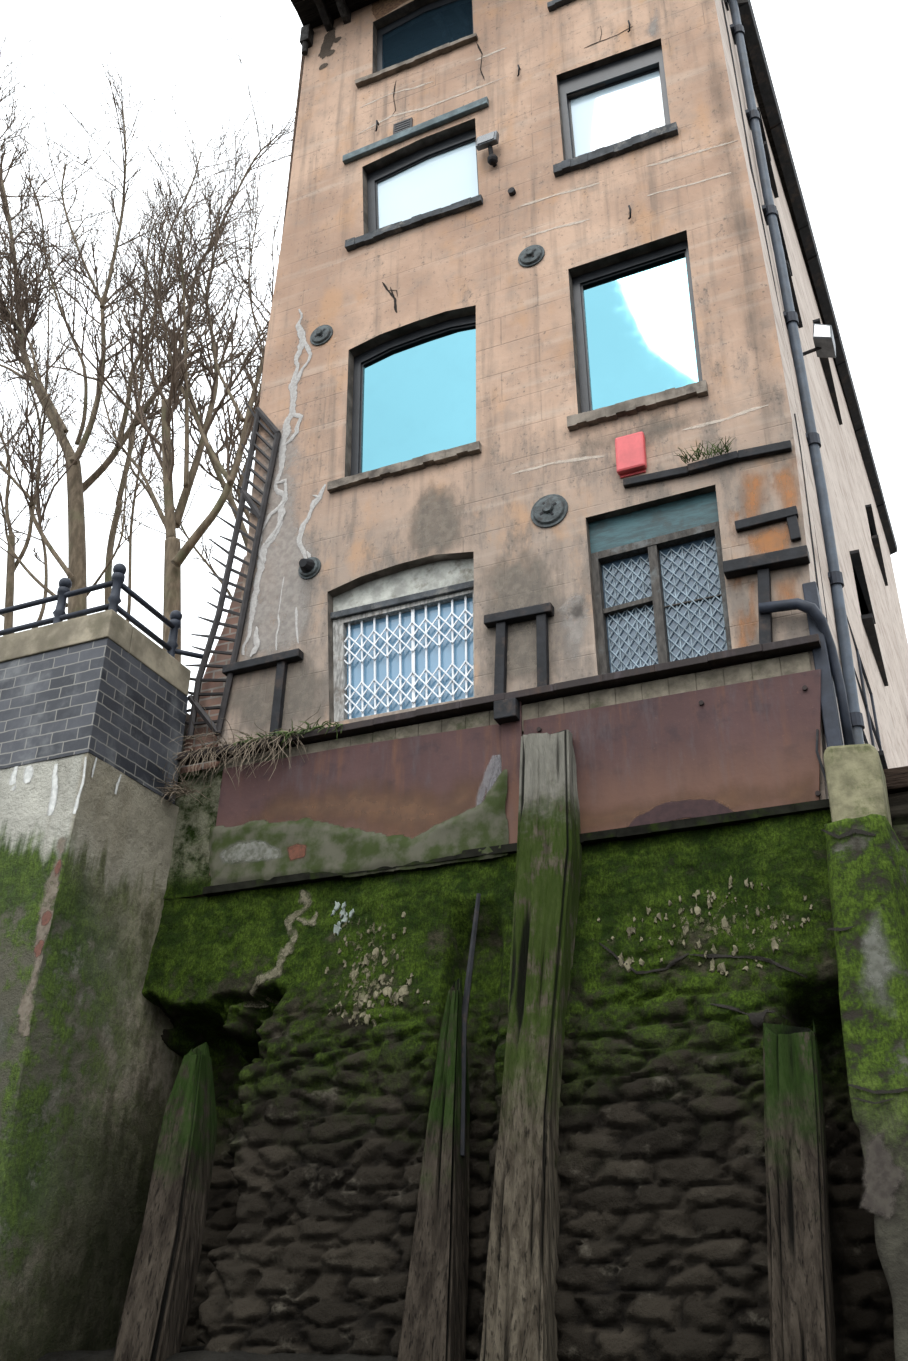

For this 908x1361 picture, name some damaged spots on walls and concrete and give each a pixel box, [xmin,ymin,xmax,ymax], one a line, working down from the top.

corrosion [753,529,788,554]
leakage [9,765,33,792]
leakage [48,763,58,815]
leakage [72,757,97,814]
spalling [209,769,509,886]
crack [243,889,318,1008]